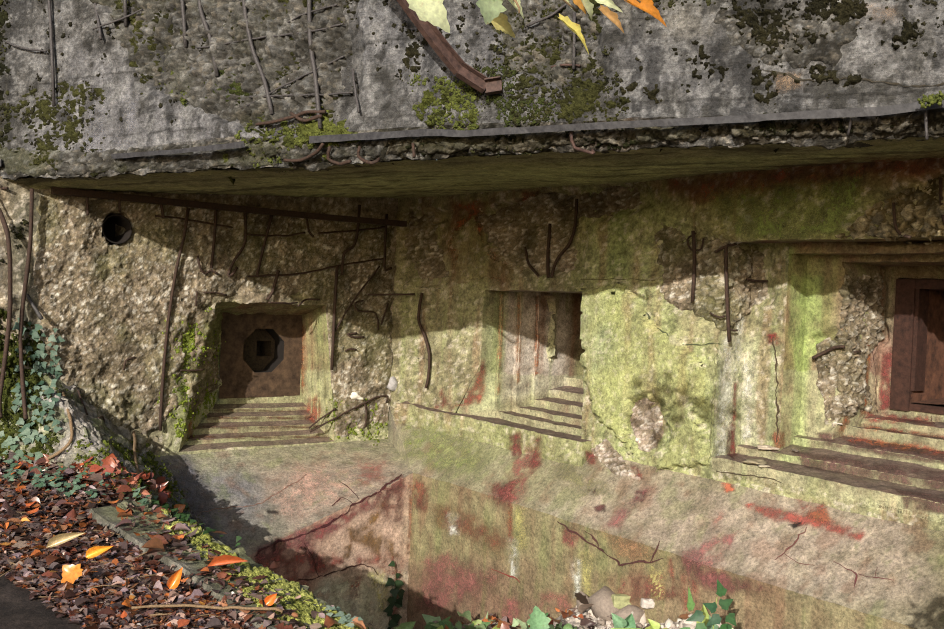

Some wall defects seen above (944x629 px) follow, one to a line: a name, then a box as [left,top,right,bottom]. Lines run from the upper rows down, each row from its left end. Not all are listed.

spalling [90,0,360,130]
spalling [714,9,860,71]
spalling [0,108,944,178]
spalling [31,192,449,437]
spalling [654,222,768,331]
spalling [815,273,886,429]
crack [200,474,307,513]
crack [254,474,402,582]
corrosion [256,464,425,582]
corrosion [439,434,541,550]
crack [557,521,663,566]
corrosion [747,501,863,540]